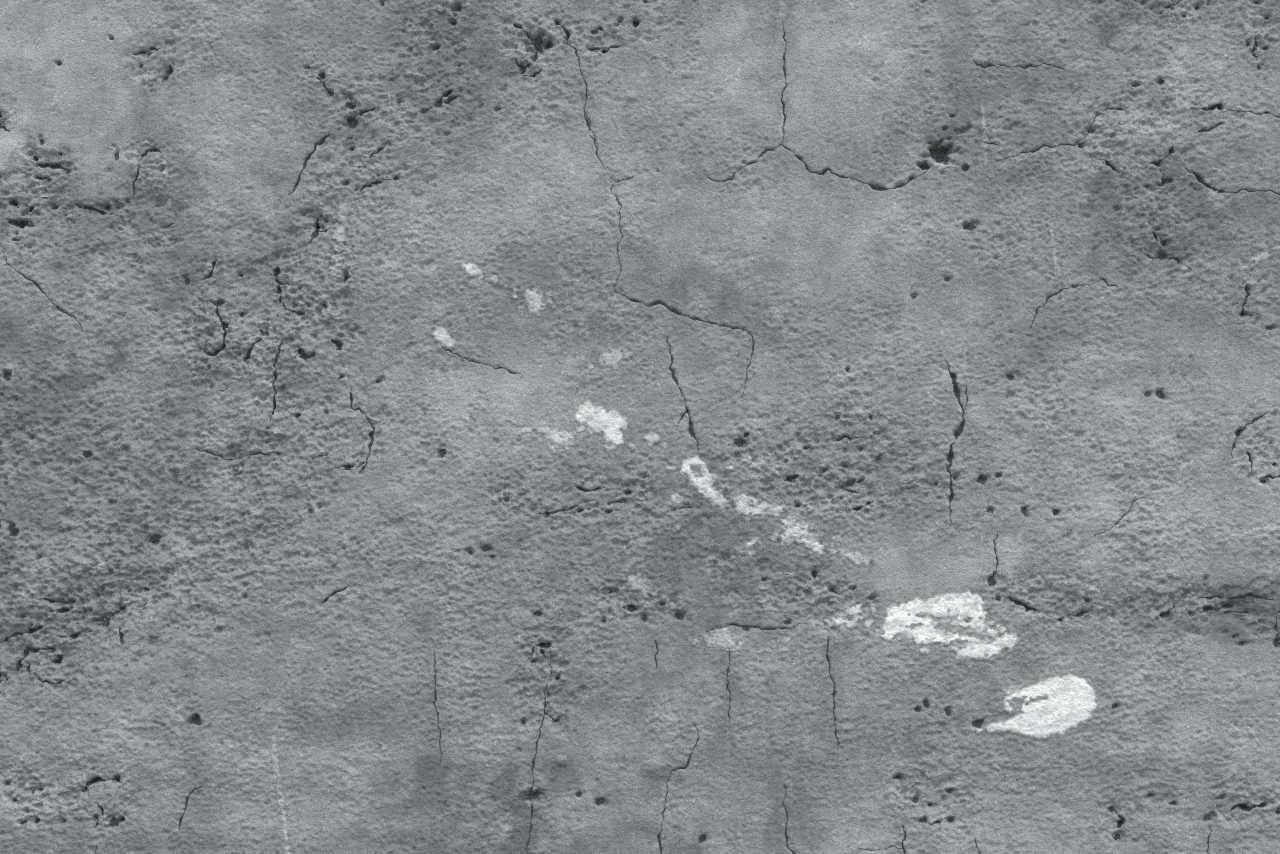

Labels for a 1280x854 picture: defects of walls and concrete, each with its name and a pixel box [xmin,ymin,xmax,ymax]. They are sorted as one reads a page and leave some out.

crack [704,20,930,191]
crack [1186,168,1280,195]
crack [564,43,754,450]
water stain [971,288,1107,411]
crack [945,359,968,523]
crack [526,641,564,854]
crack [658,726,699,854]
water stain [702,641,747,760]
crack [724,650,732,720]
crack [783,784,795,854]
water stain [880,819,914,854]
water stain [895,643,939,767]